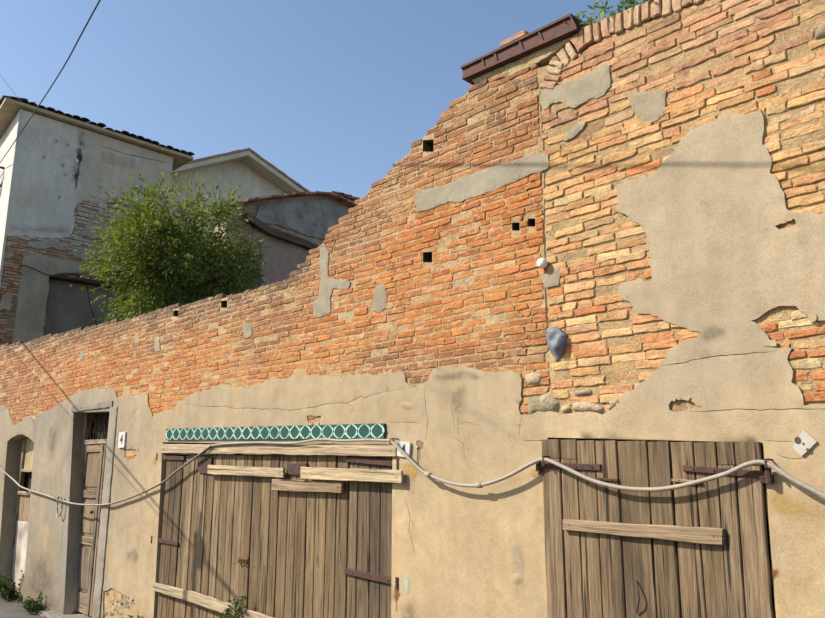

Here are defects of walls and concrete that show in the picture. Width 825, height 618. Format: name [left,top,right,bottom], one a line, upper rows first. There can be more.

crack [665,352,766,366]
flaking render [753,306,825,410]
flaking render [103,588,139,618]